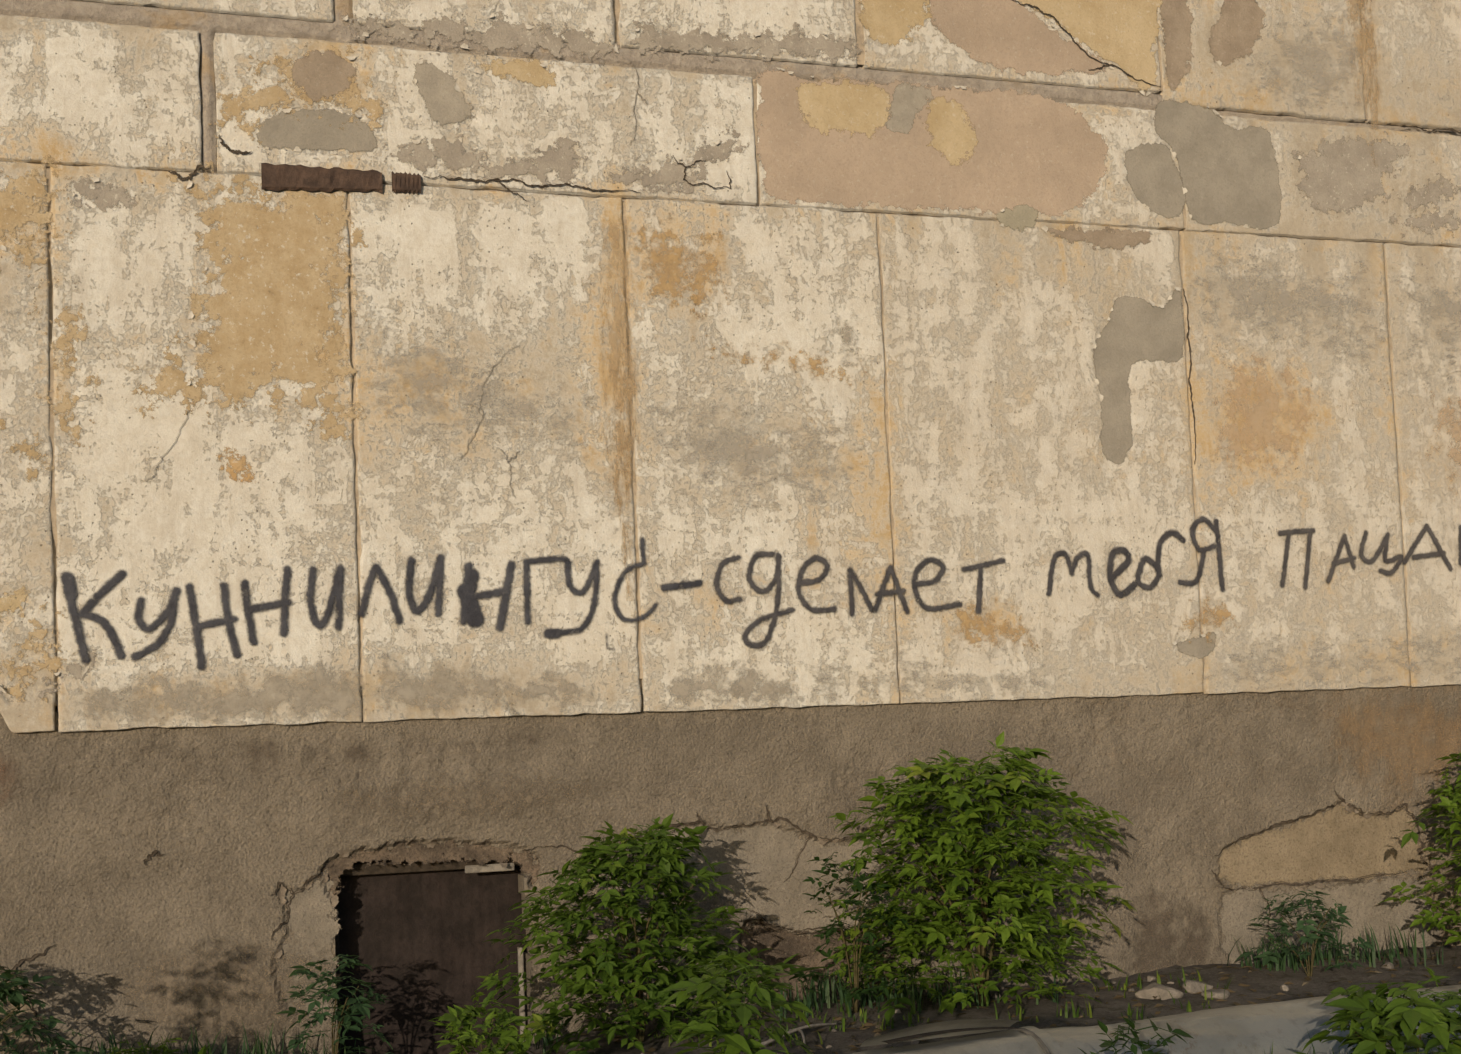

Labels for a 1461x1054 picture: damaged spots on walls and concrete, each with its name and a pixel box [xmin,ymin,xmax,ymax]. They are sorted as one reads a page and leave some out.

crack [524,805,893,882]
crack [748,910,860,938]
spalling [1218,802,1442,964]
crack [0,945,55,1054]